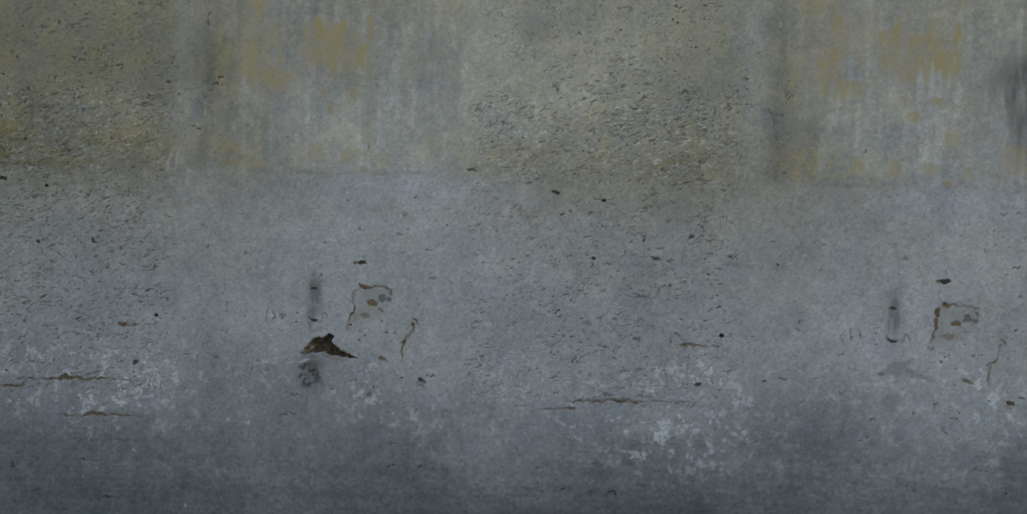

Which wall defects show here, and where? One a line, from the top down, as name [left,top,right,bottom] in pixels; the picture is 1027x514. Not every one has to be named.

damp [968,29,1027,147]
spalling [299,281,397,363]
spalling [926,301,984,353]
crack [0,372,134,389]
crack [55,410,147,419]
crack [534,395,698,412]